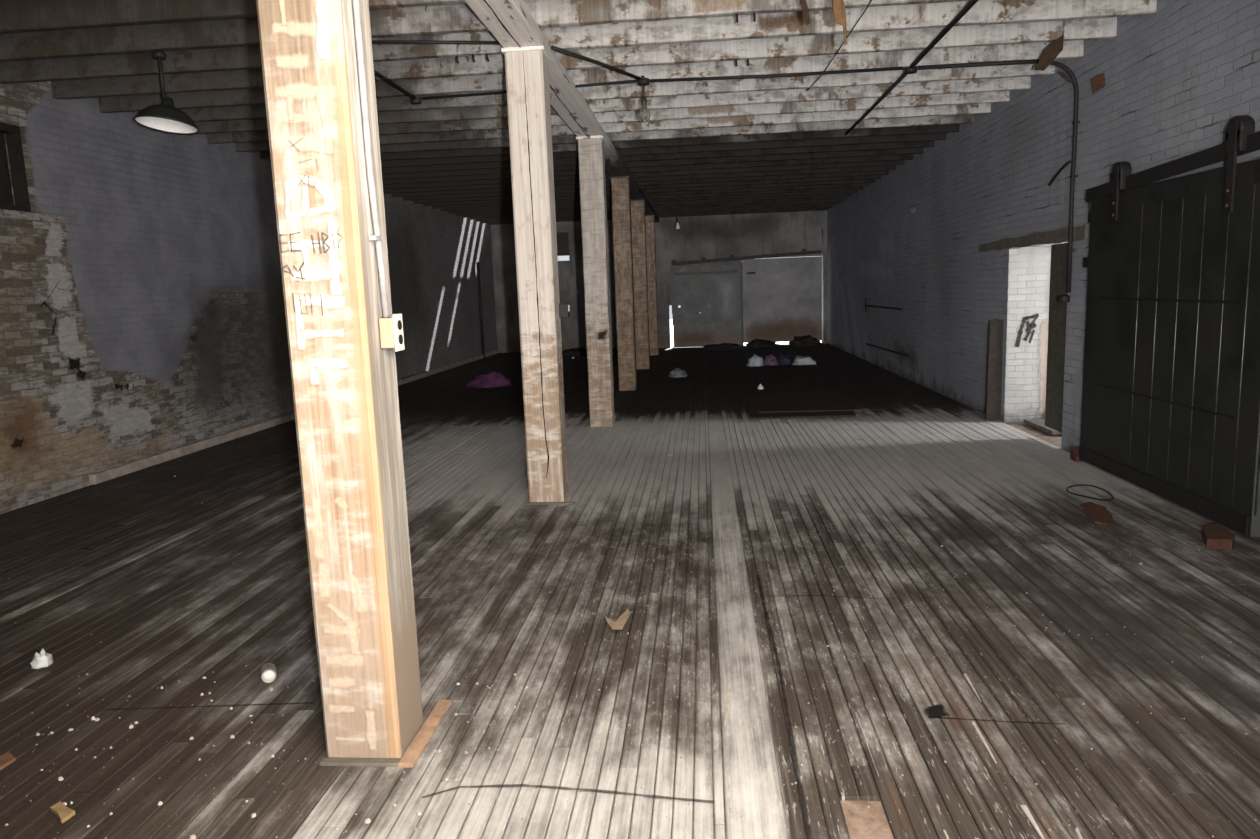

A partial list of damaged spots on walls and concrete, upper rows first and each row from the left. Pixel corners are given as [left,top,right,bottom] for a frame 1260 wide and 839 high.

peeling [683,105,745,126]
peeling [687,0,753,13]
damp [0,213,187,514]
peeling [12,81,283,452]